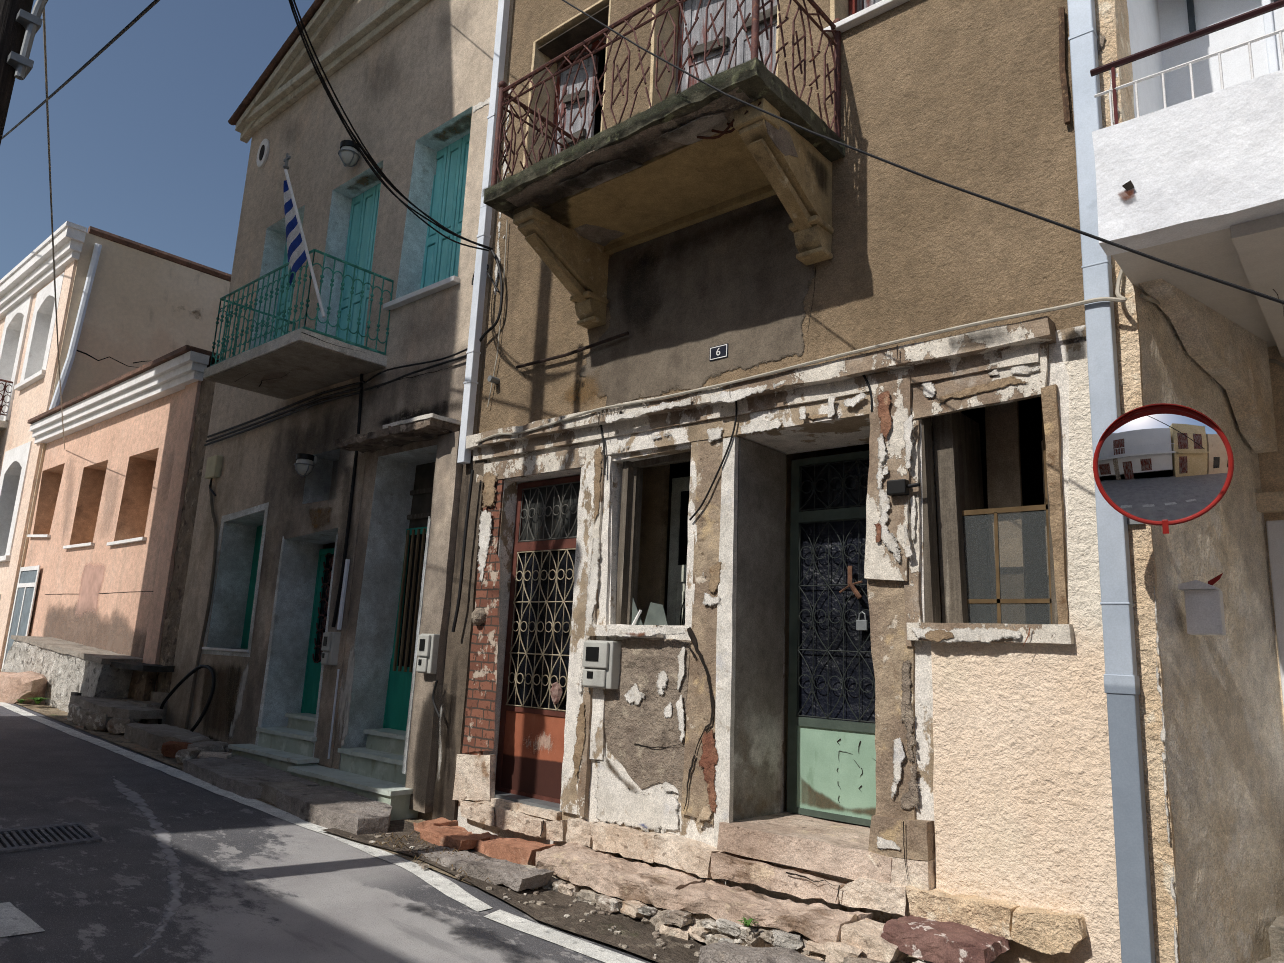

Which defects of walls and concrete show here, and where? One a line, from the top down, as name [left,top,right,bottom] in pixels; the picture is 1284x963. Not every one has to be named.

water stain [505,146,652,228]
water stain [812,156,827,191]
peeling [605,398,692,423]
peeling [709,380,786,404]
peeling [739,417,781,434]
spalling [702,562,722,607]
water stain [44,607,146,658]
flaking render [464,471,500,752]
peeling [572,446,629,779]
peeling [912,627,1022,643]
flaking render [595,625,718,833]
peeling [891,659,919,810]